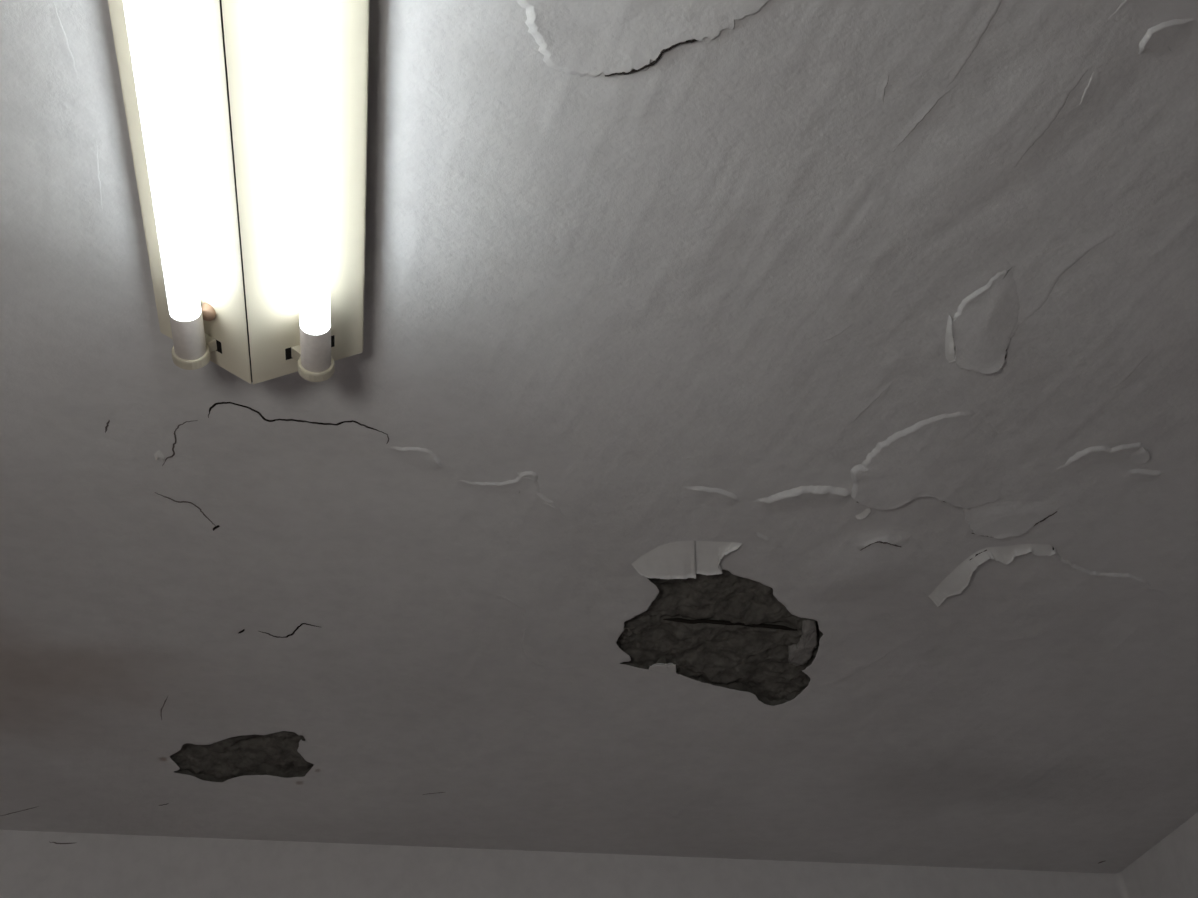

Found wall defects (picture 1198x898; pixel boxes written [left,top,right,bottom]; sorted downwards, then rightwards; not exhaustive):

flaking render [517,0,769,78]
peeling [1138,18,1196,57]
crack [156,402,389,531]
peeling [749,486,852,515]
crack [239,623,319,638]
spalling [605,541,835,711]
spalling [160,726,323,786]